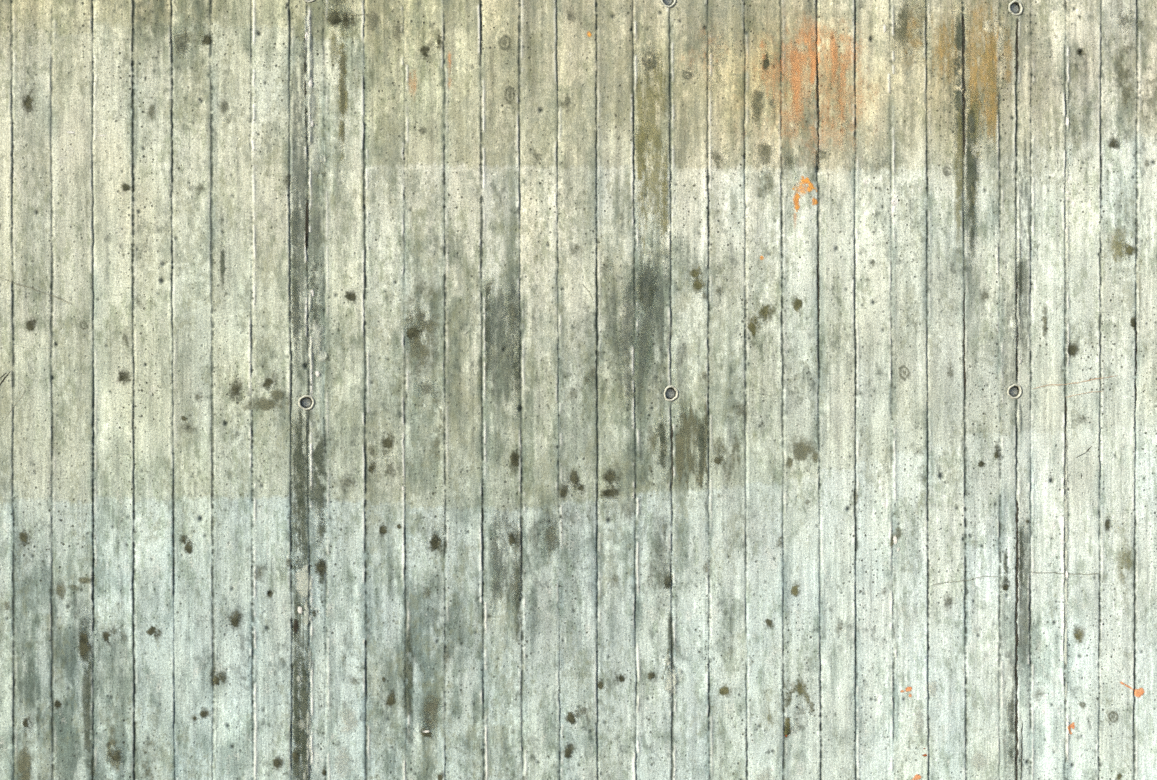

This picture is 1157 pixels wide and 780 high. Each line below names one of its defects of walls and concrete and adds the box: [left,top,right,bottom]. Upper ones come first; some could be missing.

corrosion [792,31,837,111]
corrosion [938,15,1010,248]
damp [285,70,324,358]
corrosion [793,178,818,211]
damp [485,282,520,391]
damp [624,265,668,354]
damp [231,378,283,410]
damp [650,402,739,489]
damp [286,411,326,583]
damp [229,611,241,627]
damp [273,591,316,780]